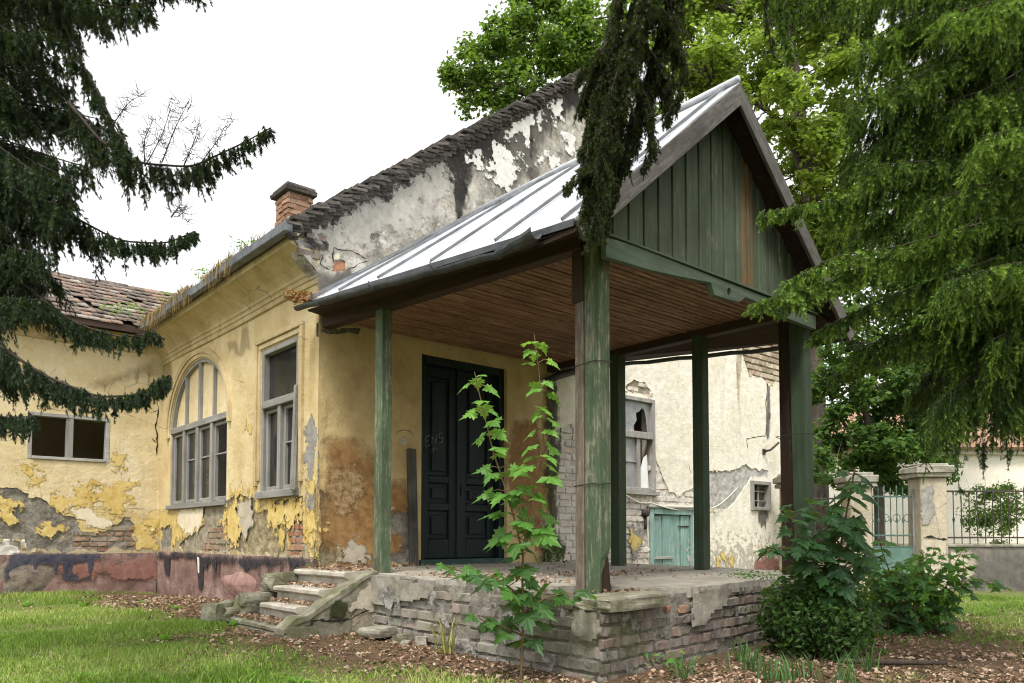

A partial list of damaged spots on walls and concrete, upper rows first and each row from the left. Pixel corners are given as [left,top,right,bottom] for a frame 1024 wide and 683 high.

leakage [304,81,589,250]
peeling [465,98,577,192]
crack [320,247,369,271]
peeling [295,160,457,272]
spalling [625,380,653,398]
spalling [740,344,779,386]
spalling [0,413,374,582]
spalling [533,422,576,561]
spalling [626,463,694,564]
spalling [709,465,768,512]
leakage [4,552,101,582]
leakage [158,551,304,590]